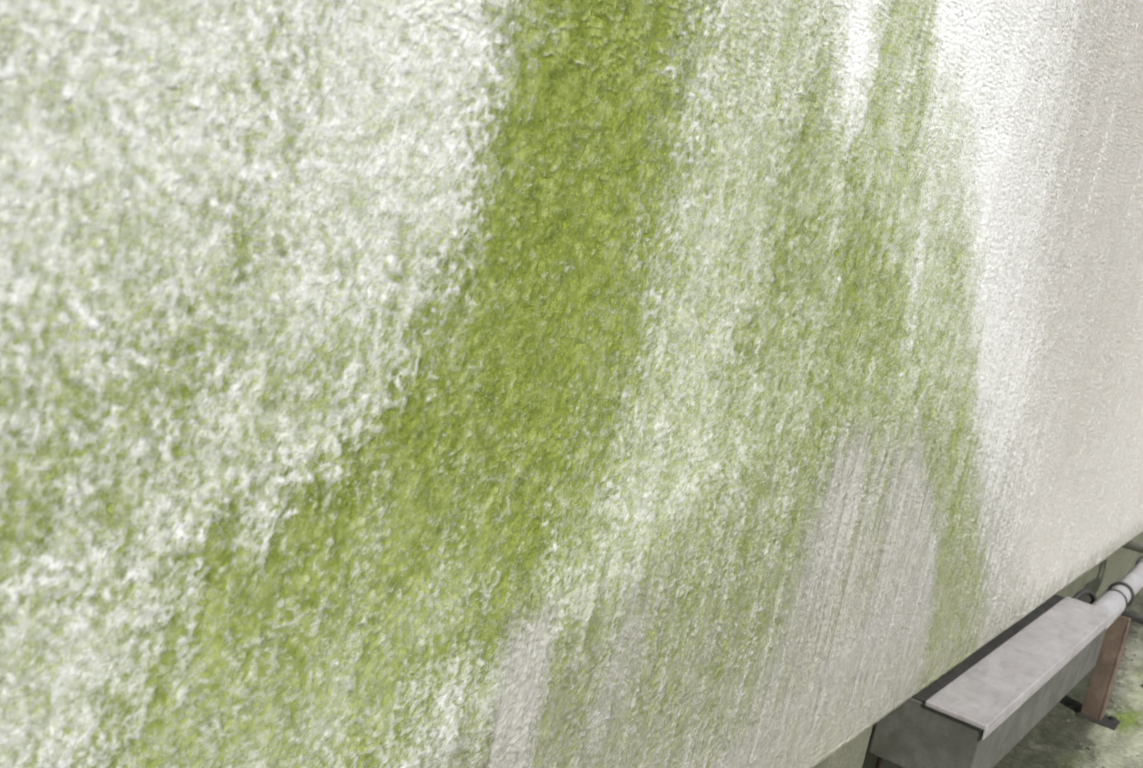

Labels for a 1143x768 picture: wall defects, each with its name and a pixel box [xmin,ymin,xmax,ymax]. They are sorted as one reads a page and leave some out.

water stain [4,172,216,355]
water stain [103,250,249,412]
water stain [233,207,266,283]
water stain [254,0,1143,768]
water stain [0,356,259,768]